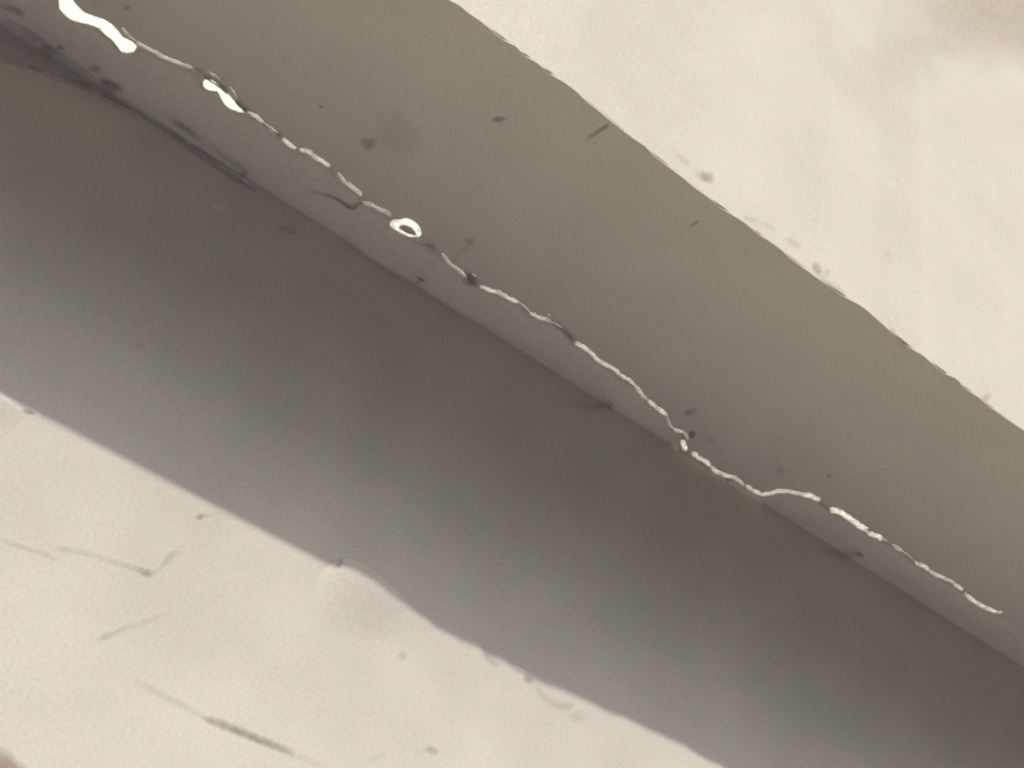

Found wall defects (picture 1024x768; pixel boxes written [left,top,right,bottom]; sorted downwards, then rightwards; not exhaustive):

crack [59,0,391,217]
crack [426,245,1003,614]